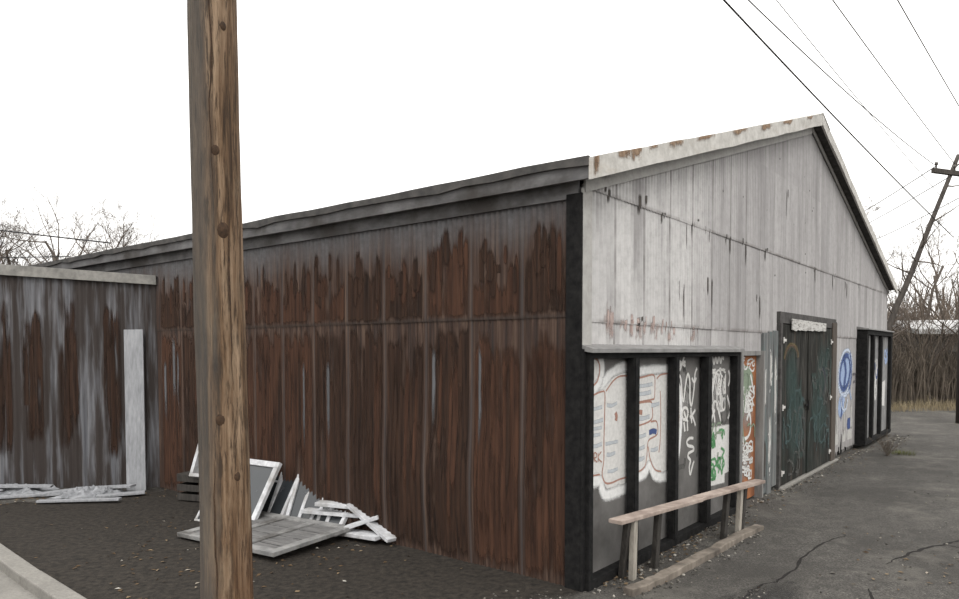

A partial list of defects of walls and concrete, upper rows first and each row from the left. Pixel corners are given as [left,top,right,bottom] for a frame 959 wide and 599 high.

rust [619,145,657,159]
rust [161,276,198,487]